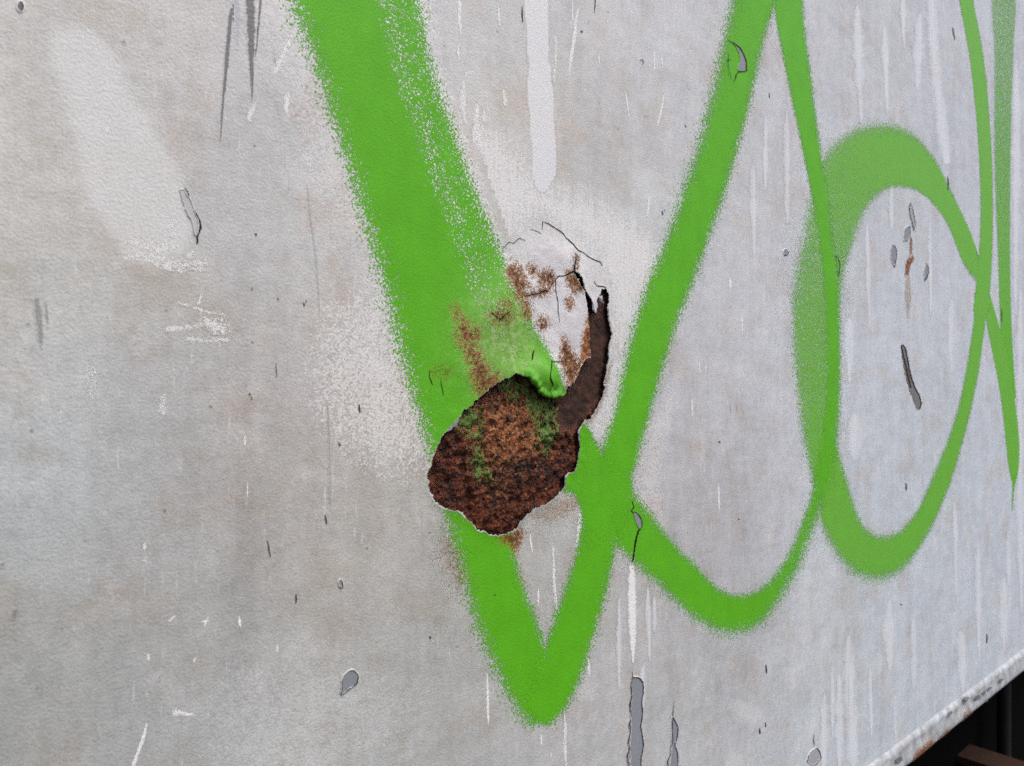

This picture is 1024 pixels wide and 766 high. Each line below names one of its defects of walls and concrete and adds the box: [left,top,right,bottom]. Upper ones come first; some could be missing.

peeling [728,40,747,81]
peeling [35,9,204,278]
peeling [374,0,670,450]
crack [494,222,606,323]
rust [427,248,613,558]
spalling [901,344,922,409]
crack [631,501,640,562]
peeling [174,611,441,766]
peeling [627,671,644,766]
peeling [668,709,679,766]